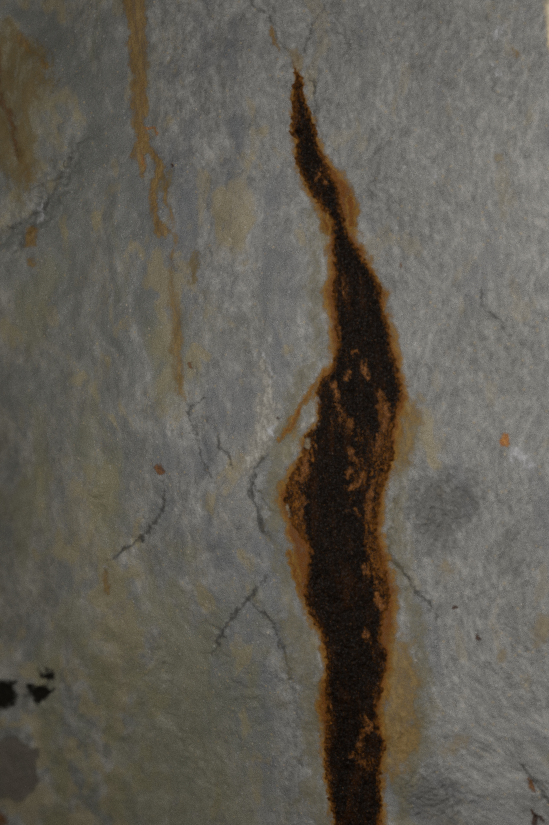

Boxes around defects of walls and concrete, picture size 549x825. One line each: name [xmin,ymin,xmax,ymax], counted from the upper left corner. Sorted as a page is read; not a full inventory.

rust [124,0,178,244]
rust [269,27,421,825]
damp [0,669,55,710]